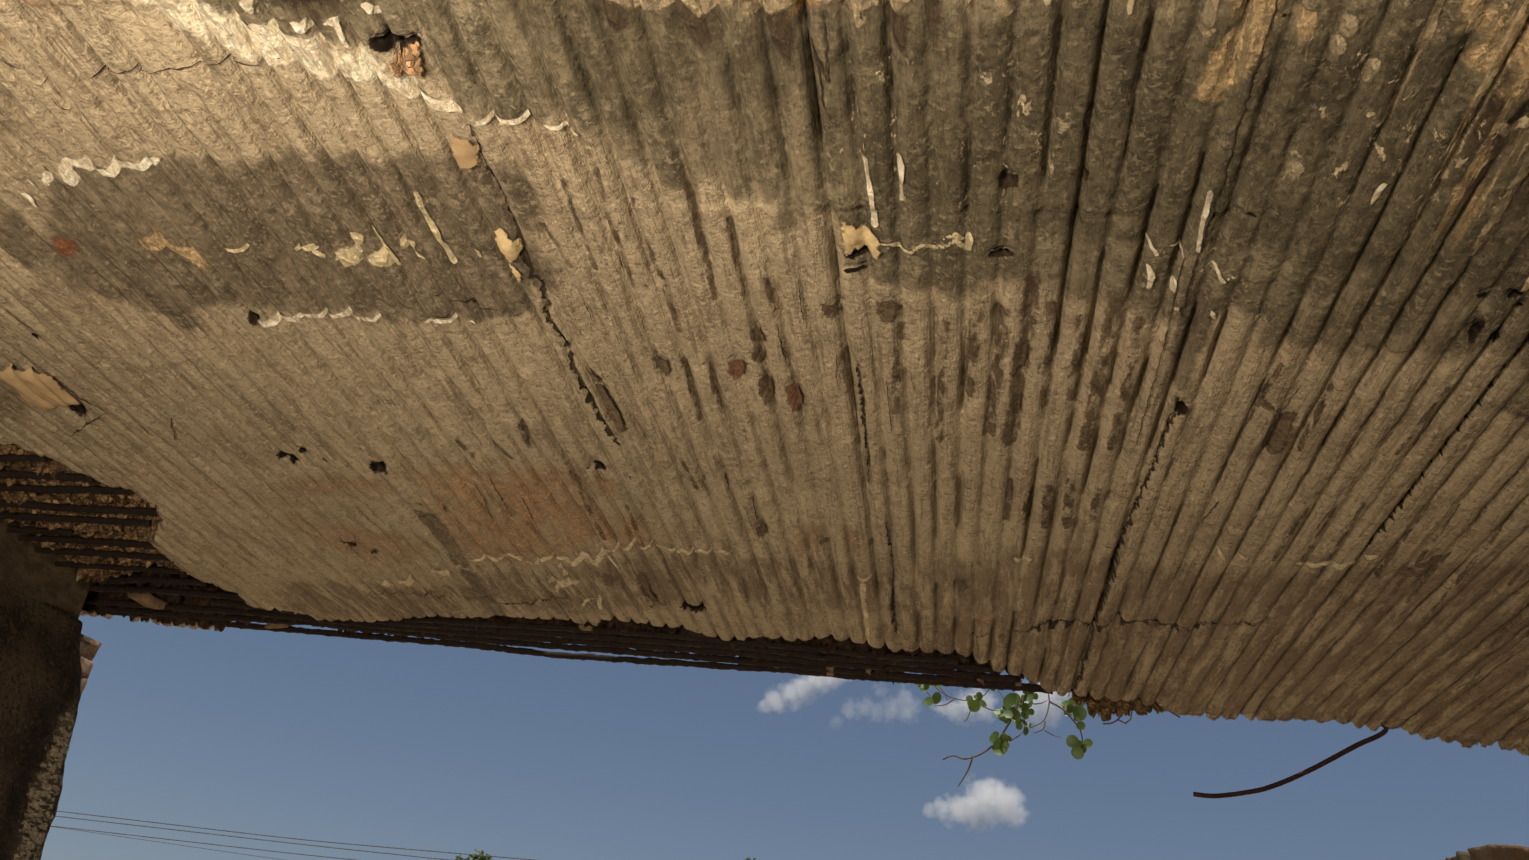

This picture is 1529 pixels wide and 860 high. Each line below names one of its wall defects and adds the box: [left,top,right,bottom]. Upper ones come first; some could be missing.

flaking render [389,41,423,78]
rust [1196,0,1280,101]
rust [1297,7,1317,42]
flaking render [0,363,79,410]
water stain [0,148,571,330]
spalling [448,135,480,170]
crack [375,124,632,466]
crack [885,0,1277,689]
crack [1289,335,1529,617]
spalling [0,442,1163,722]